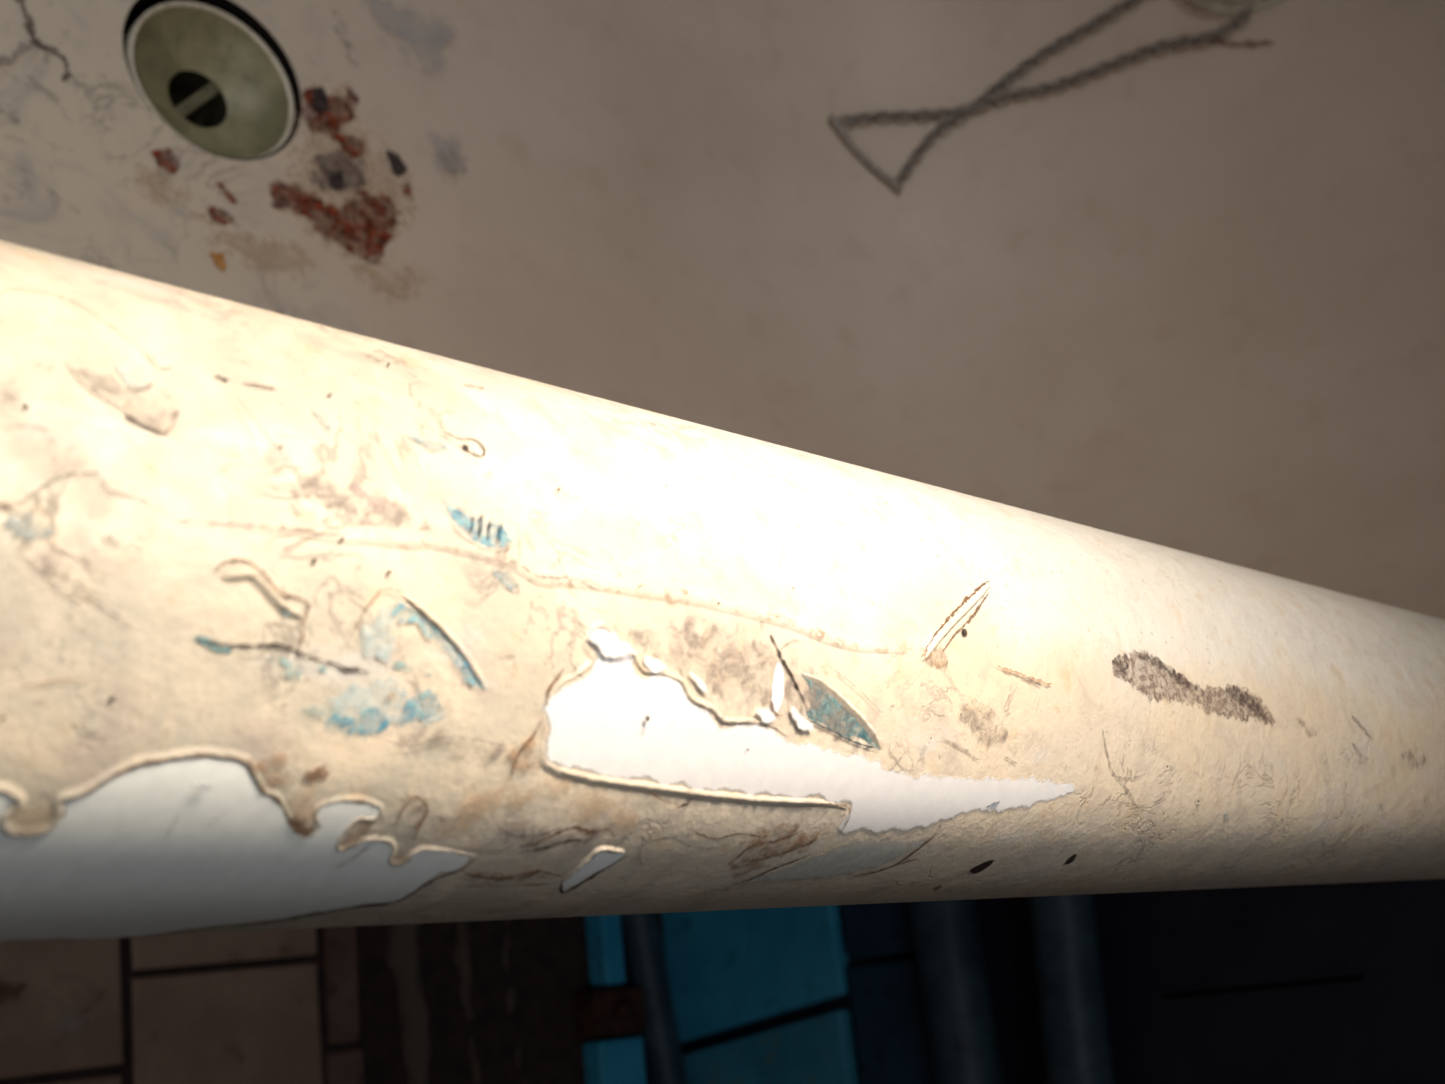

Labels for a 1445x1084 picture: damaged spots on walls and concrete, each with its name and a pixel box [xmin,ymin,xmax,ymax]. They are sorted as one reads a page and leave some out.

crack [0,0,71,82]
corrosion [151,147,180,173]
corrosion [208,182,237,225]
corrosion [270,86,412,264]
corrosion [210,251,226,271]
peeling [537,620,1075,833]
peeling [0,746,475,941]